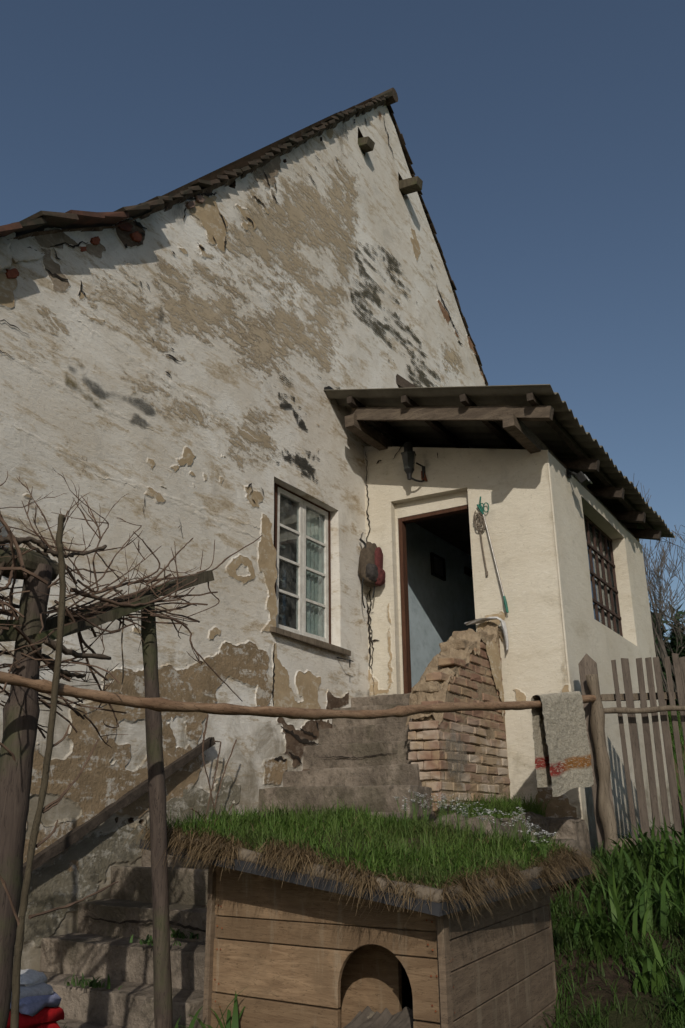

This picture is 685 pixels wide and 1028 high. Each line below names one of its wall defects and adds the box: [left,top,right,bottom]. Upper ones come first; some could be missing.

spalling [0,262,19,310]
peeling [33,151,360,472]
peeling [436,299,476,377]
leakage [83,378,109,397]
leakage [124,397,155,427]
leakage [278,392,308,431]
peeling [169,445,223,487]
leakage [272,448,320,484]
peeling [144,485,167,505]
spalling [158,484,349,827]
spalling [14,666,150,952]
crack [83,916,206,932]